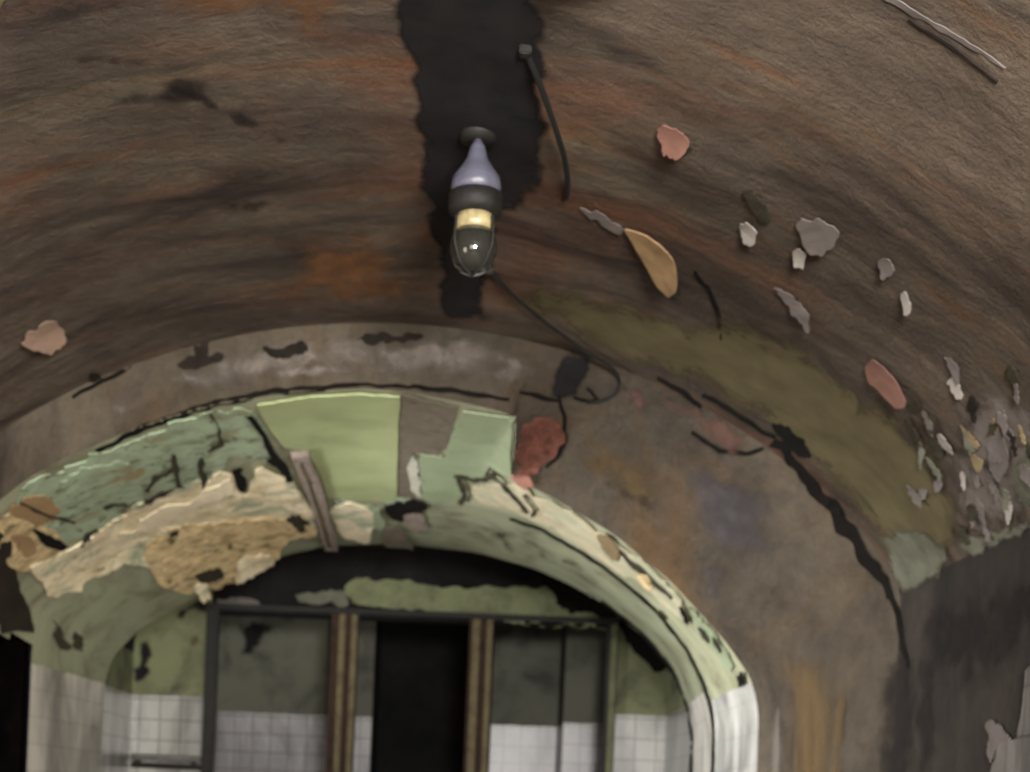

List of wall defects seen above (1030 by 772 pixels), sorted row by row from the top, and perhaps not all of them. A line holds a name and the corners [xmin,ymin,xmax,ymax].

peeling [657,125,692,161]
peeling [580,208,679,298]
peeling [739,190,770,247]
peeling [793,218,840,269]
peeling [22,321,67,355]
crack [20,356,599,548]
peeling [522,288,1030,590]
peeling [0,393,749,688]
crack [657,377,910,669]
crack [453,471,714,772]
water stain [880,655,910,772]
peeling [985,720,1011,763]